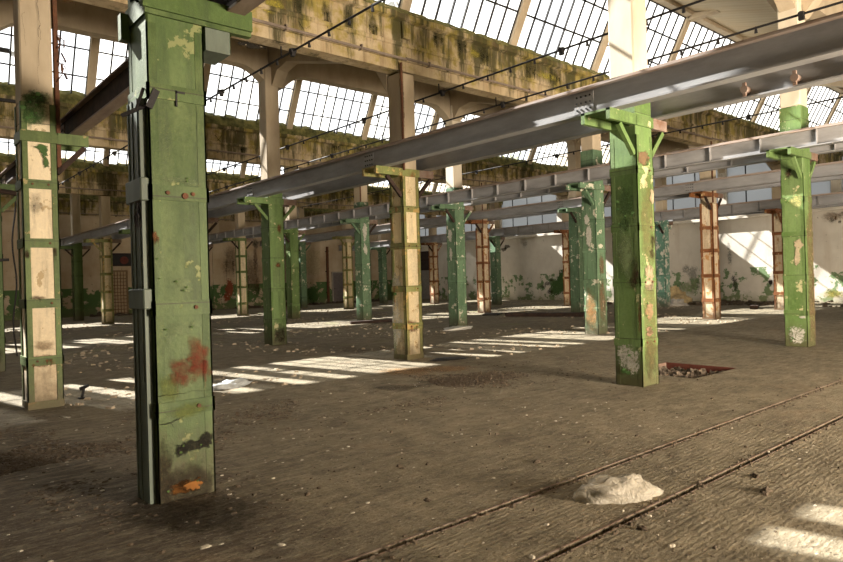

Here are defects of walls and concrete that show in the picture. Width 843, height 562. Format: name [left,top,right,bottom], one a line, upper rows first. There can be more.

water stain [457,40,489,61]
peeling [540,269,564,297]
peeling [787,316,806,344]
peeling [617,345,639,375]